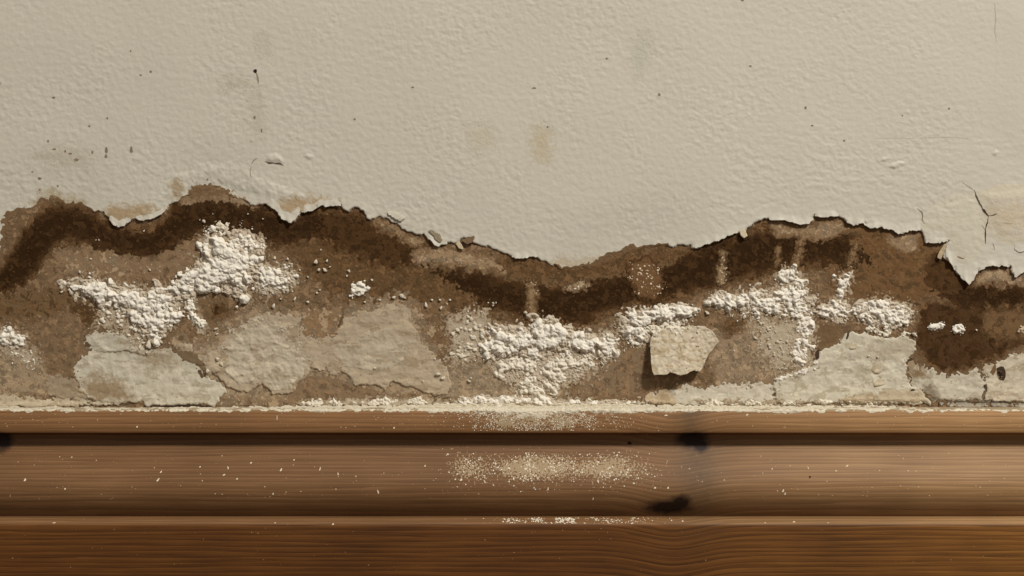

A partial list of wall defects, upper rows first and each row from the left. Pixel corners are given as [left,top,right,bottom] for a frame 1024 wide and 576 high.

water stain [0,171,1024,424]
peeling [0,196,1024,407]
crack [962,182,1011,250]